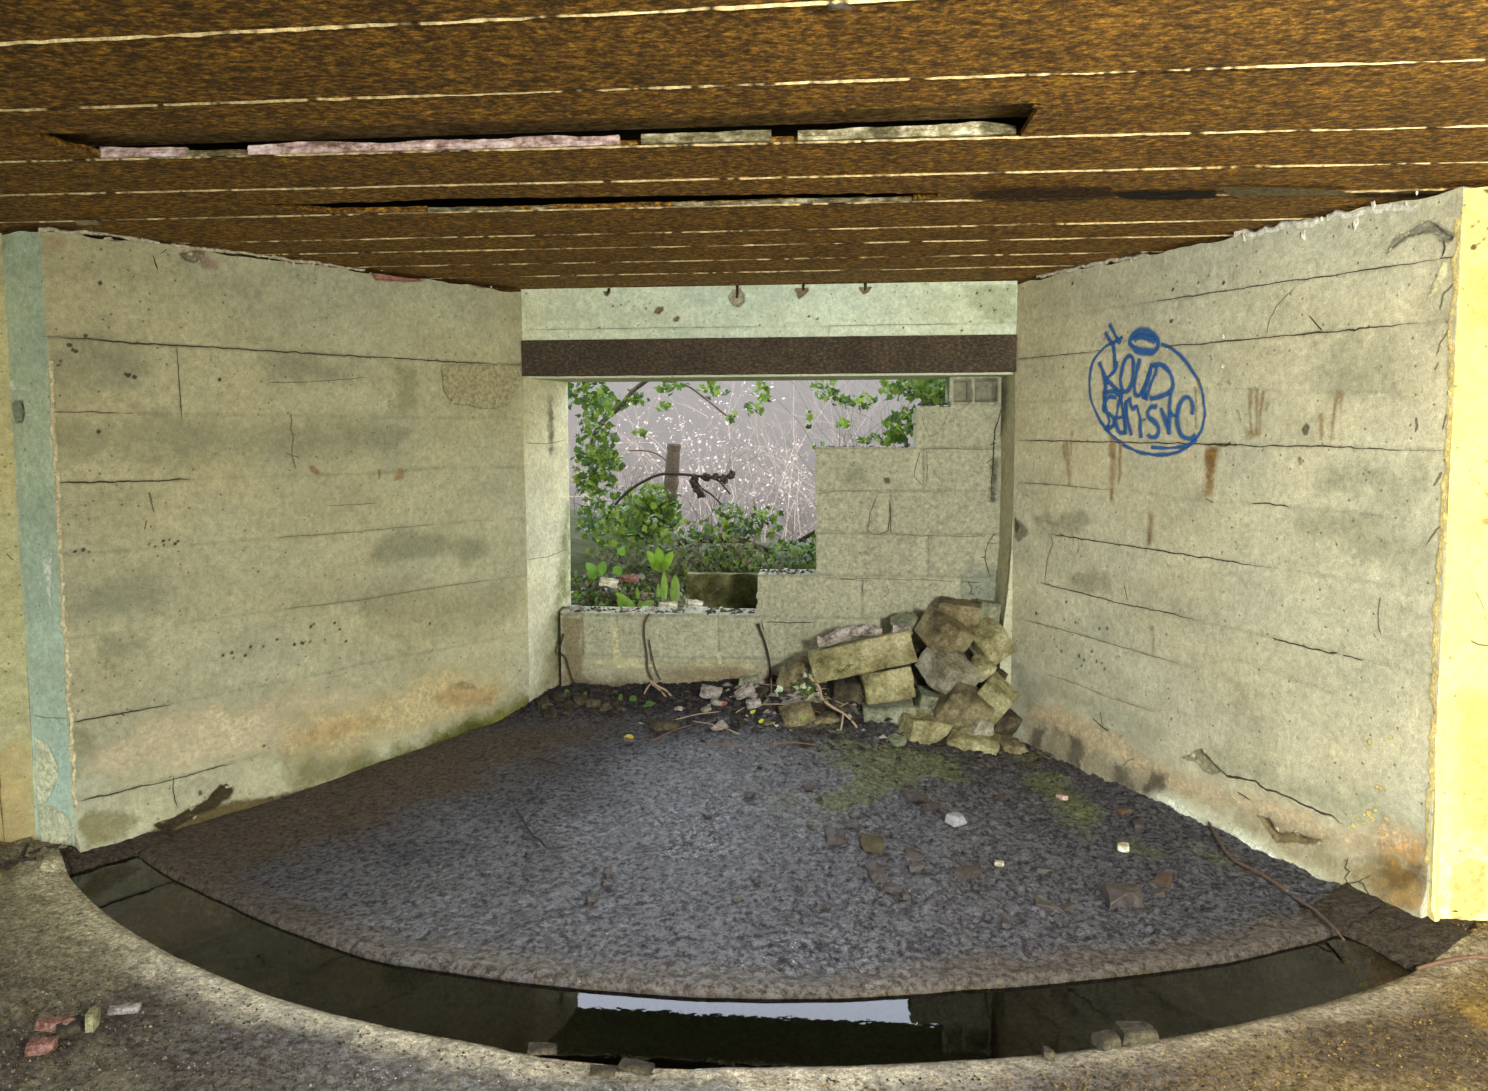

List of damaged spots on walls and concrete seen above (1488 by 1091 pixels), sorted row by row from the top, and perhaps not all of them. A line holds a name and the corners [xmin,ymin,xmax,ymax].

peeling [100,135,620,158]
peeling [641,130,771,145]
peeling [798,121,1016,142]
spalling [11,401,25,423]
rust [1110,439,1122,498]
rust [1206,449,1216,495]
spalling [35,334,89,846]
damp [96,670,502,832]
damp [1028,722,1199,823]
damp [79,812,135,844]
crack [1219,770,1371,895]
damp [1235,823,1427,914]